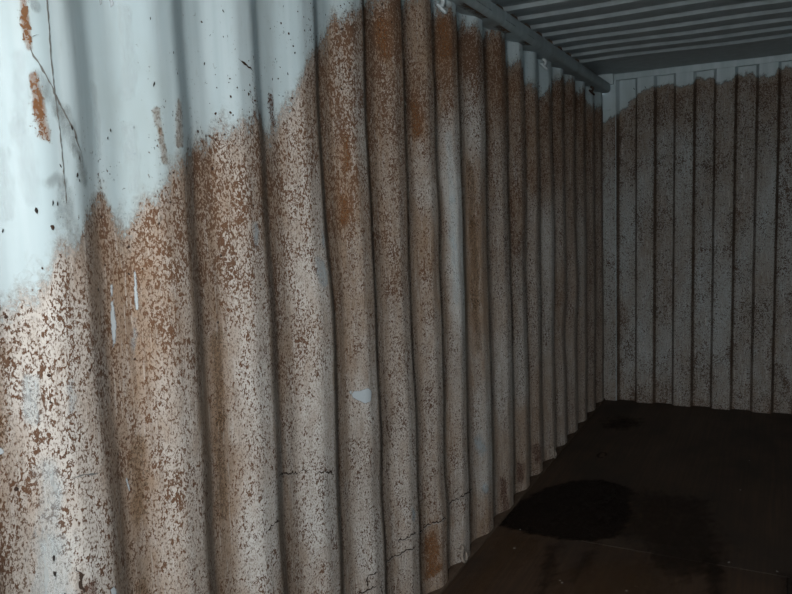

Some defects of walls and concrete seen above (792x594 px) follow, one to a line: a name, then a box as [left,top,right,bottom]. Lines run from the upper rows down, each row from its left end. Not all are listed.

corrosion [0,0,470,594]
corrosion [457,19,792,544]
crack [280,468,334,476]
crack [359,488,473,594]
leakage [499,480,633,569]